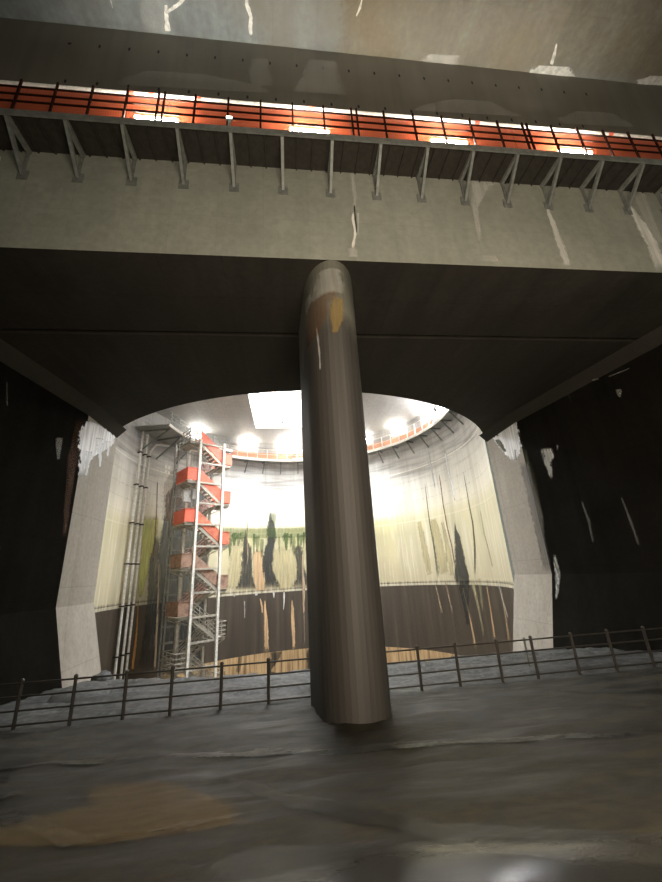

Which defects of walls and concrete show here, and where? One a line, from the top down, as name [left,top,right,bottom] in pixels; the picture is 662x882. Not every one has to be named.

leakage [164,0,185,31]
leakage [245,0,253,34]
peeling [493,423,522,460]